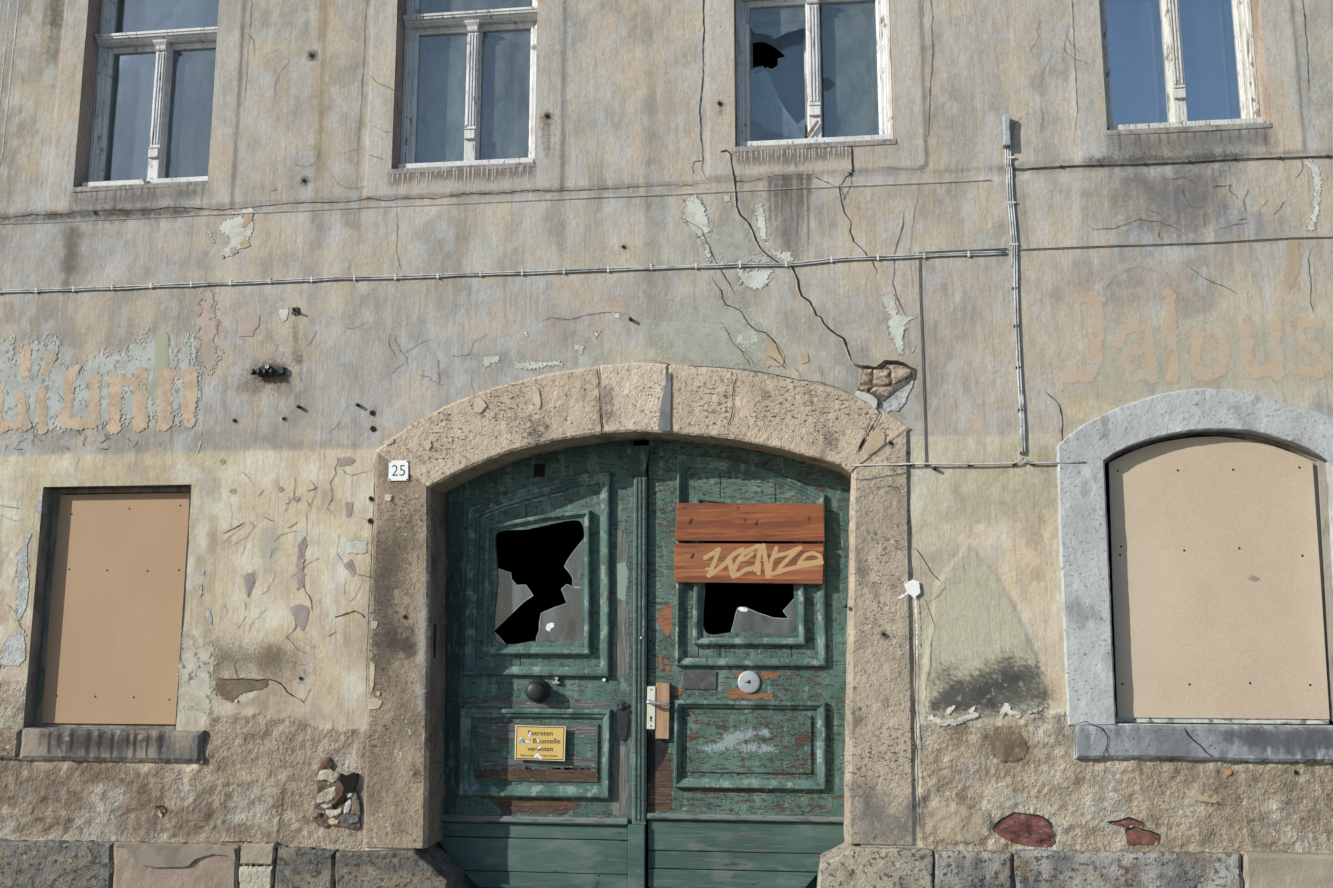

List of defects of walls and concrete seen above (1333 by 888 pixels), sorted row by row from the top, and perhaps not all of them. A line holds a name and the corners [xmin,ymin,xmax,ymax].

peeling [207,208,256,258]
crack [1,0,933,492]
peeling [681,188,794,290]
peeling [652,293,809,368]
spalling [854,292,916,401]
peeling [337,456,355,467]
spalling [0,533,32,668]
peeling [244,572,254,597]
peeling [290,536,309,631]
peeling [176,630,268,714]
spalling [312,757,362,829]